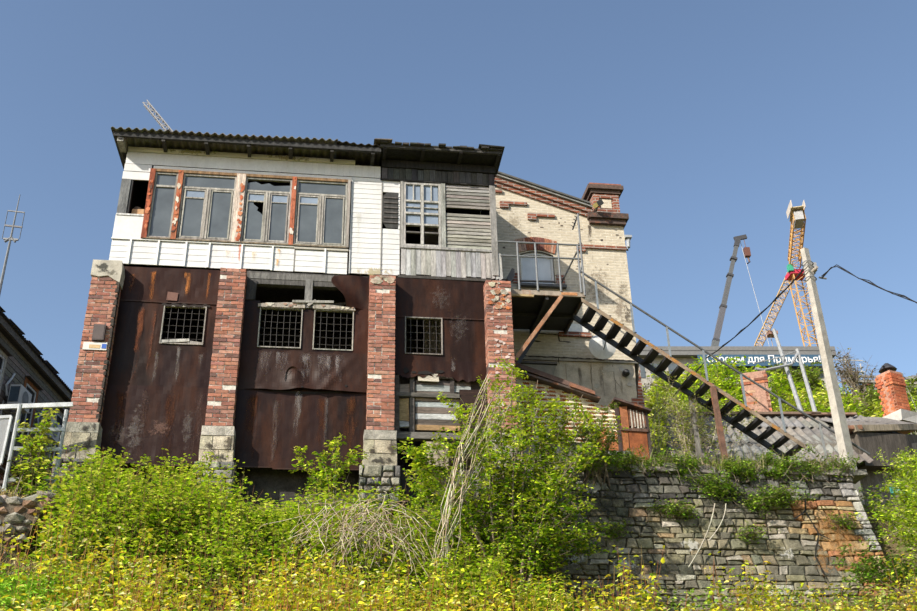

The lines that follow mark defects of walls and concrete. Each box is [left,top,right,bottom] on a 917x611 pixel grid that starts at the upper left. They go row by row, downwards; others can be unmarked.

peeling [235,183,245,241]